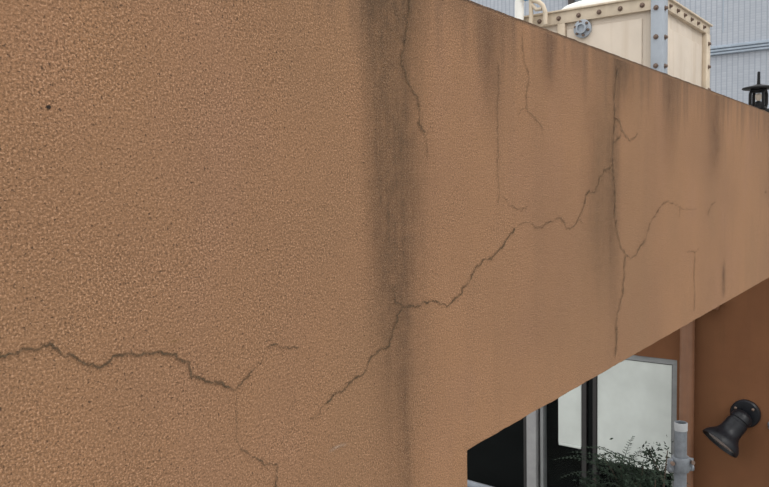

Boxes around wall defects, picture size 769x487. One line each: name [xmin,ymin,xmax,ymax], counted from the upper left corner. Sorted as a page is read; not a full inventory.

crack [0,342,252,389]
crack [327,228,515,403]